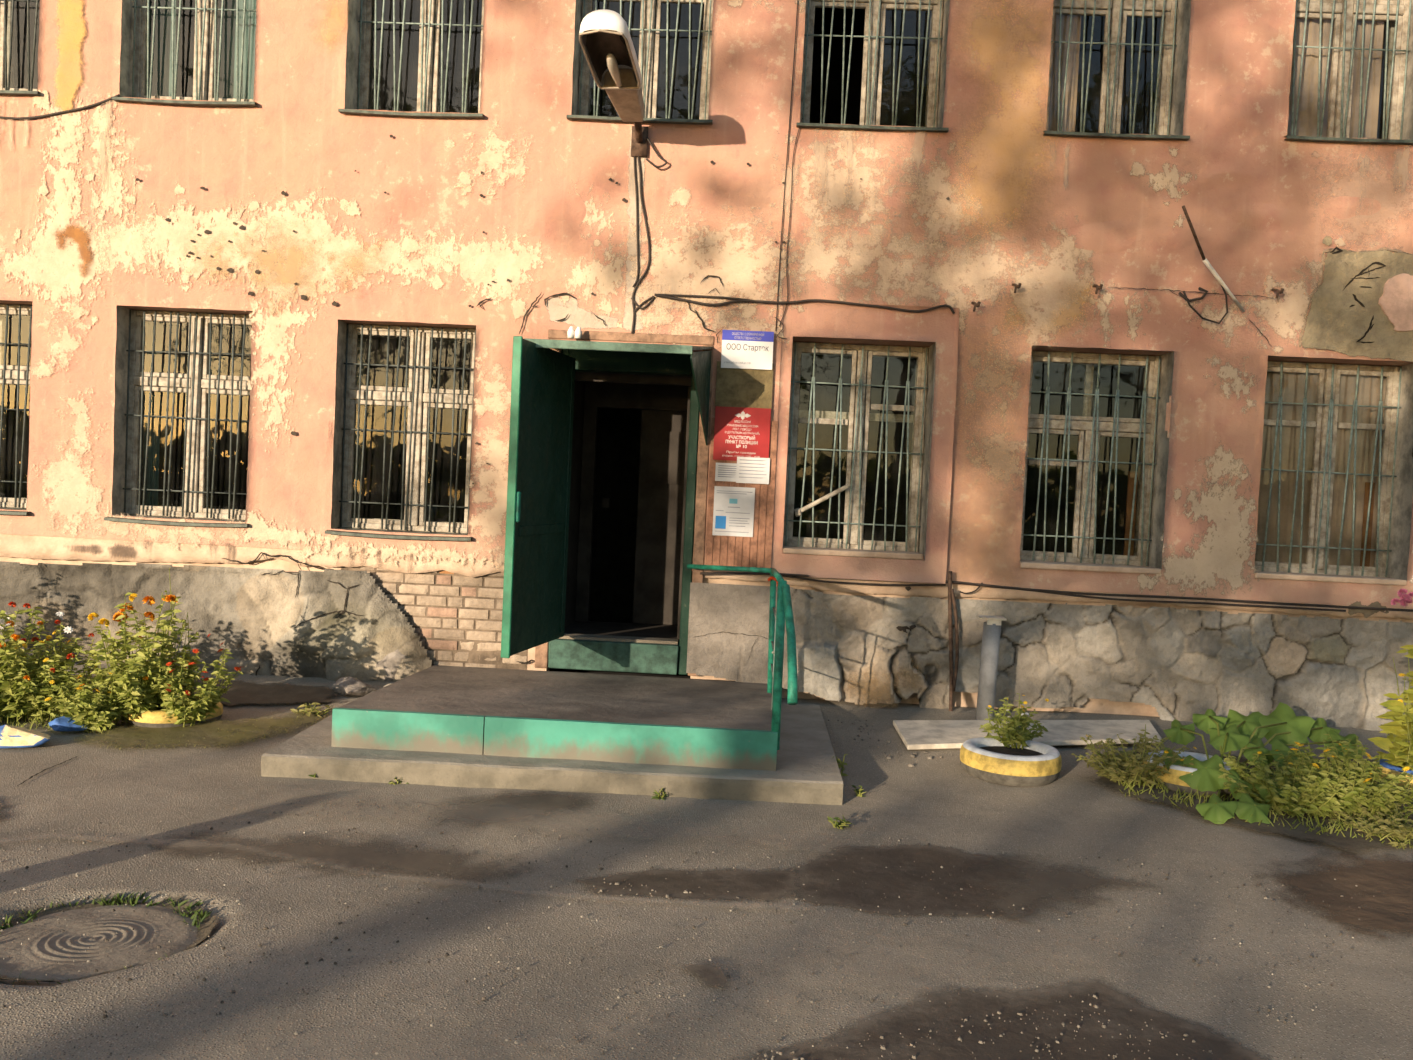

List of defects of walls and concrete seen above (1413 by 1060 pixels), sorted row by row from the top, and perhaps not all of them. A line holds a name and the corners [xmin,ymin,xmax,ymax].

peeling [0,87,1150,453]
spalling [1187,236,1413,414]
flaking render [31,348,528,670]
crack [221,552,363,629]
peeling [1137,441,1260,597]